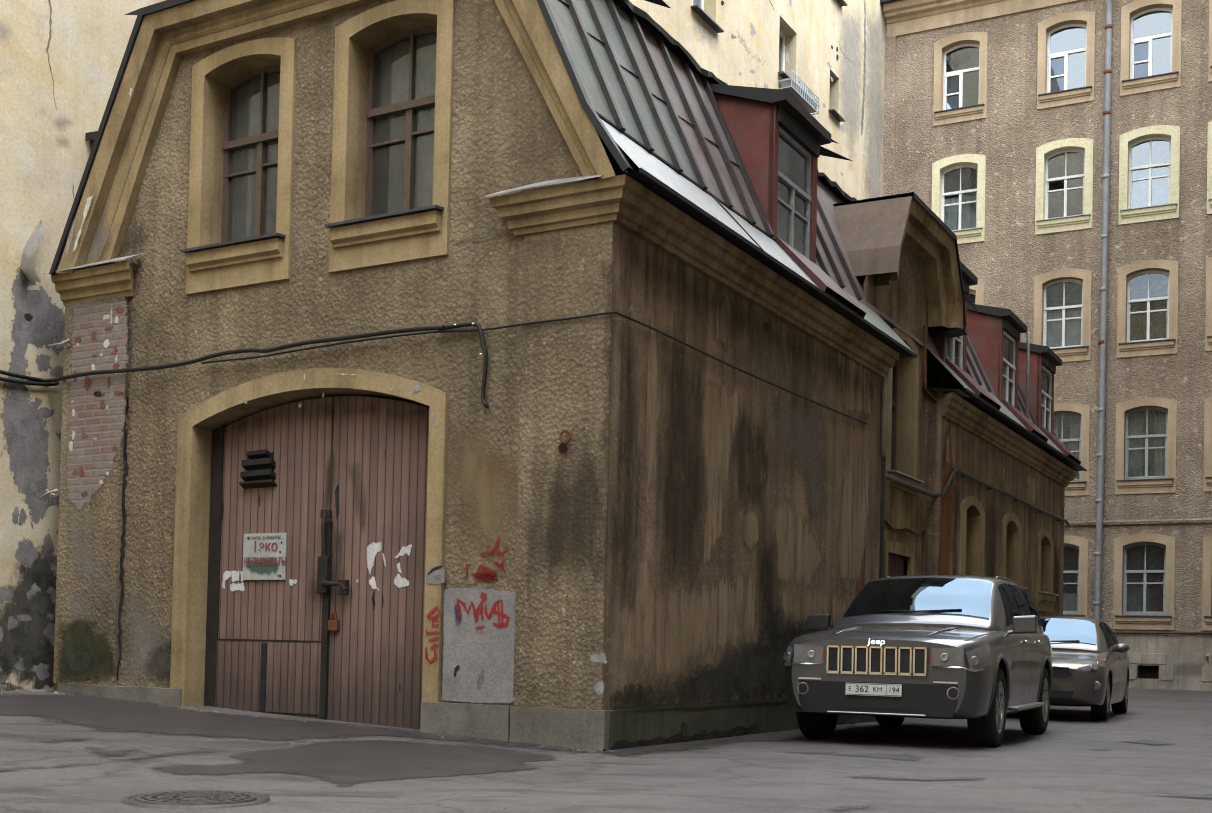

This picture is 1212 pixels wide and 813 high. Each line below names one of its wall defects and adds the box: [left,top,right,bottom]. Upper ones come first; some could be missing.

crack [46,0,57,109]
flaking render [0,267,129,529]
leakage [610,305,871,706]
leakage [834,724,861,732]